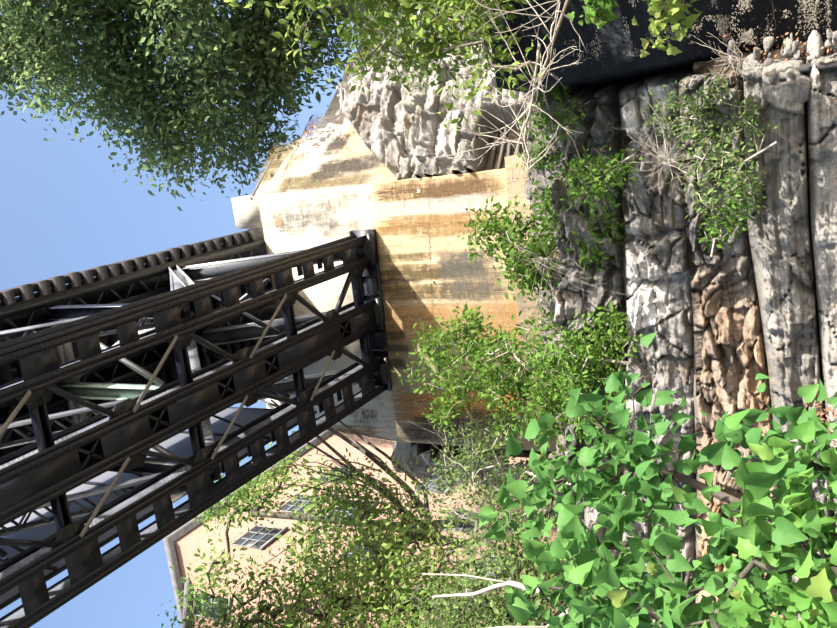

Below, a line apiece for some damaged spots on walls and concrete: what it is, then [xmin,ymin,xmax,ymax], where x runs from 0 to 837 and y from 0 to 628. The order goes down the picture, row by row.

peeling [622,0,833,56]
damp [257,111,379,190]
damp [377,174,497,218]
damp [379,230,501,307]
damp [383,332,408,368]